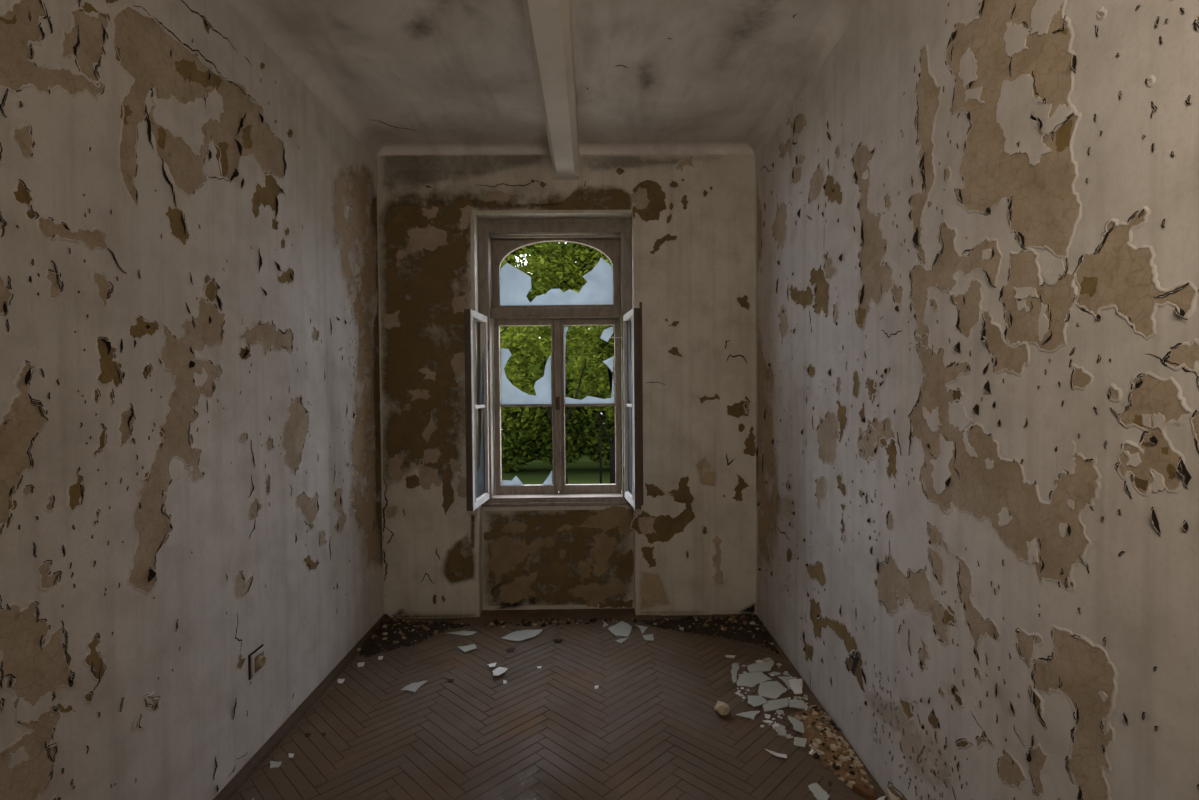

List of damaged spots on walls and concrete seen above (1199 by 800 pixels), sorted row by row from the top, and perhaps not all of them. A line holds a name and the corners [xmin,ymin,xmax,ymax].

peeling [0,273,14,332]
peeling [0,360,101,537]
peeling [91,272,294,600]
peeling [238,386,357,572]
peeling [310,316,347,344]
peeling [630,475,725,586]
peeling [761,0,1199,800]
peeling [0,542,107,800]
peeling [119,691,161,733]